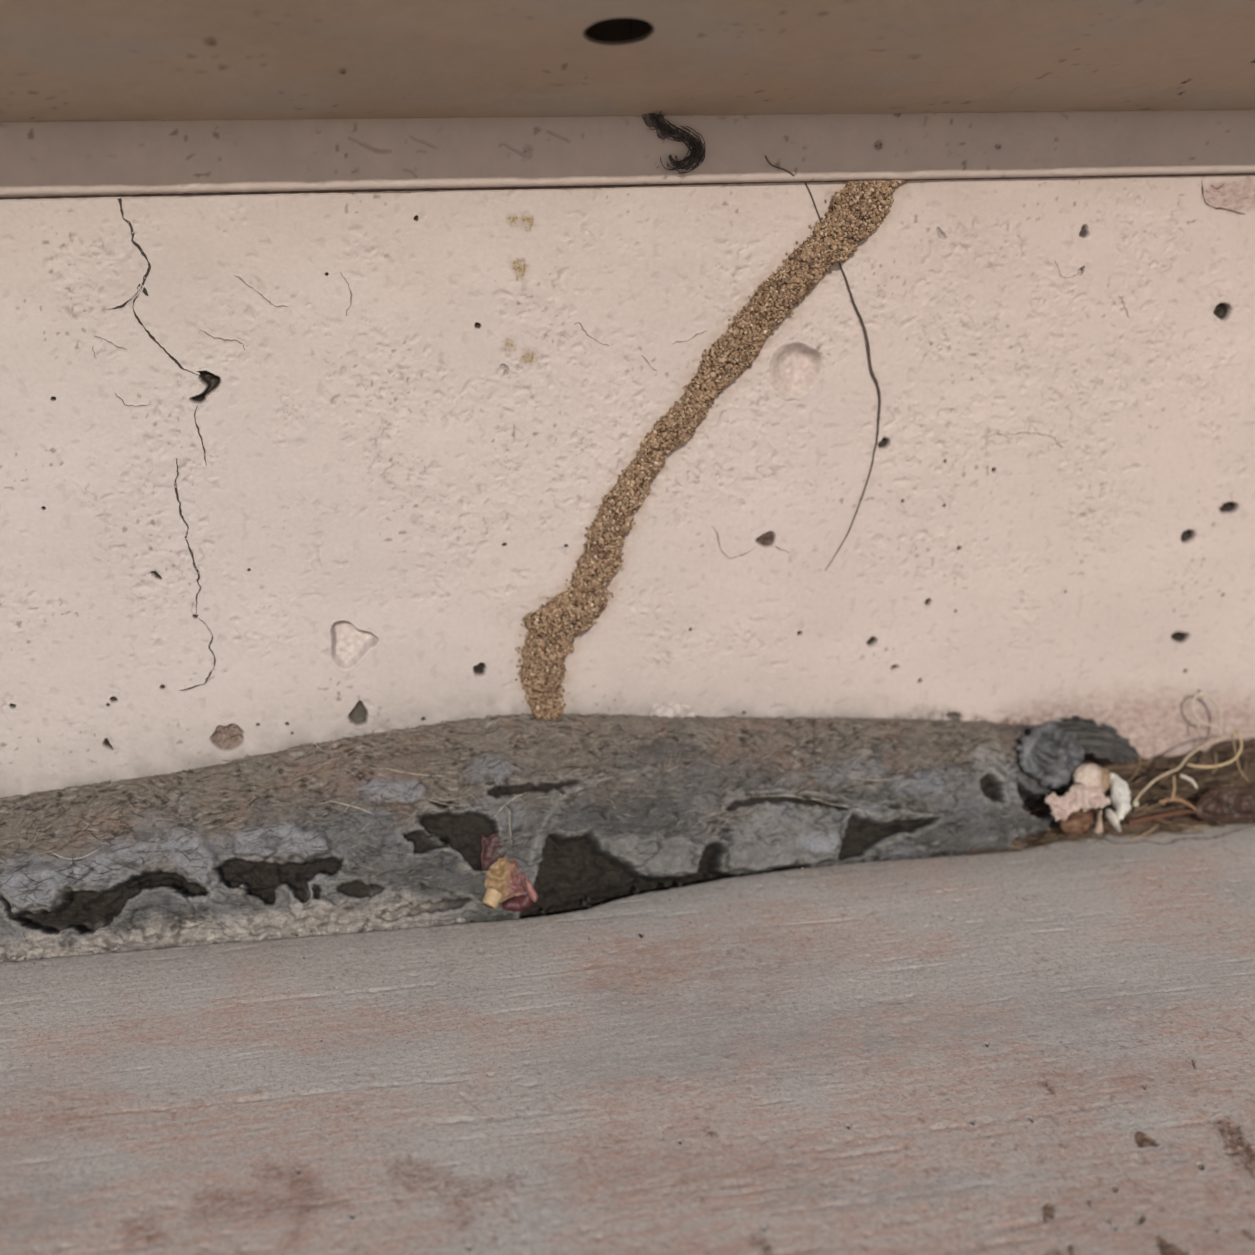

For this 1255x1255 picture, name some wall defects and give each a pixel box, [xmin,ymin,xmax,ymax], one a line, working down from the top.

crack [199,328,247,350]
crack [91,198,217,692]
peeling [1109,773,1139,820]